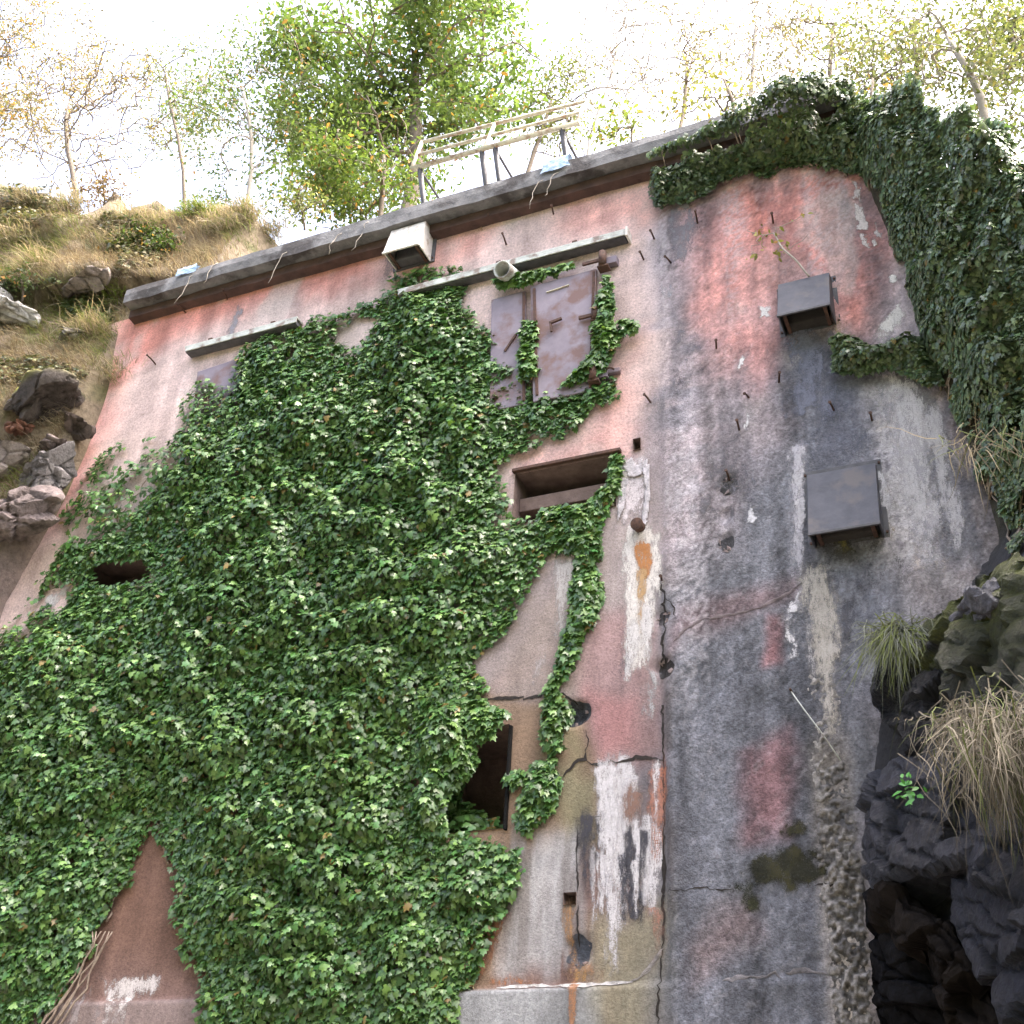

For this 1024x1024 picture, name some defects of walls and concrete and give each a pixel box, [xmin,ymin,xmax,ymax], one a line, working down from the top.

peeling [616,457,650,525]
rust [634,540,653,624]
crack [660,584,675,678]
spalling [569,700,591,727]
rust [622,761,667,863]
damp [496,753,663,988]
crack [563,705,733,1024]